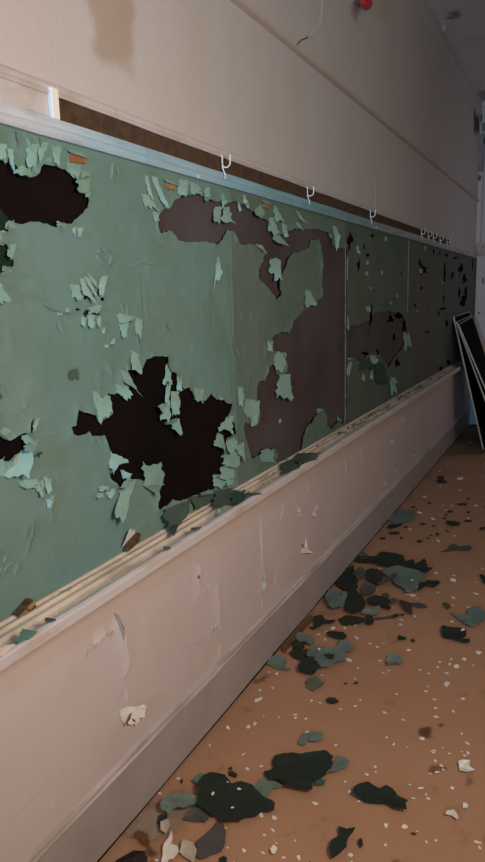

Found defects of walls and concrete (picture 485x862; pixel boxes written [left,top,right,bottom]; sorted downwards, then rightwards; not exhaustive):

peeling [0,140,91,305]
peeling [57,274,143,348]
peeling [424,246,473,307]
peeling [72,175,416,550]
peeling [0,418,54,508]